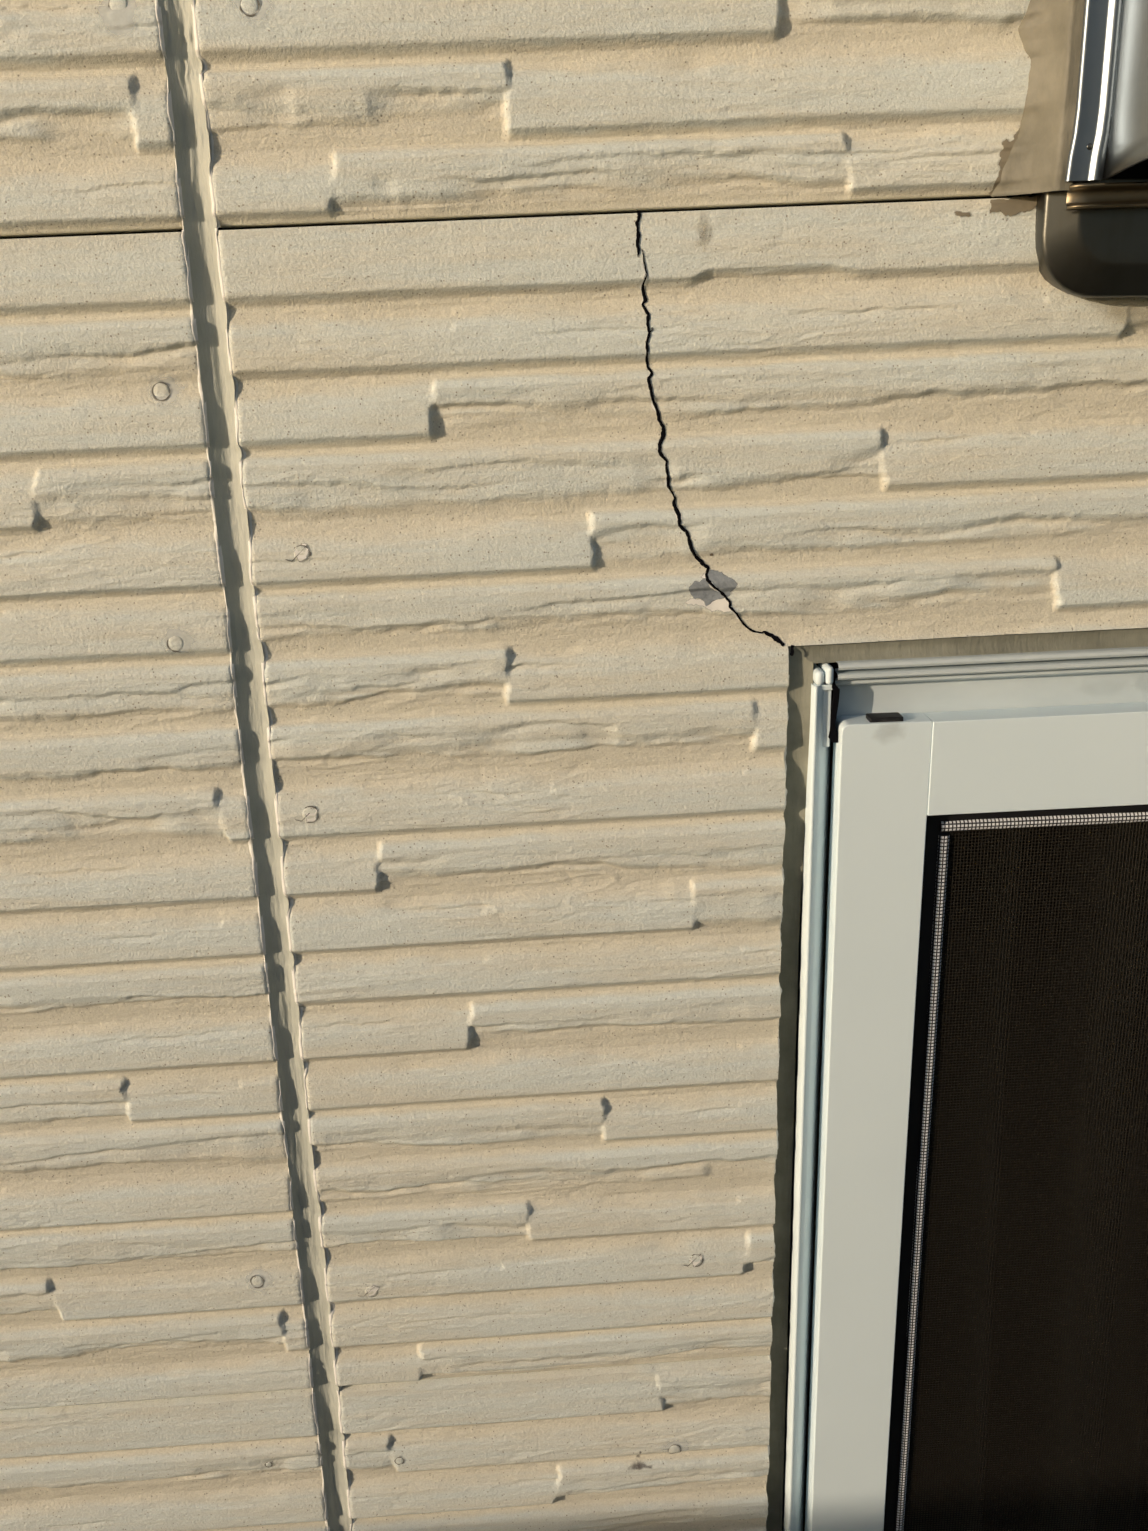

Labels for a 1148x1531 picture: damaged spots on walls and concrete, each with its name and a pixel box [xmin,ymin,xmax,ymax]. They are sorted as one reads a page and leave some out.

crack [635,210,794,656]